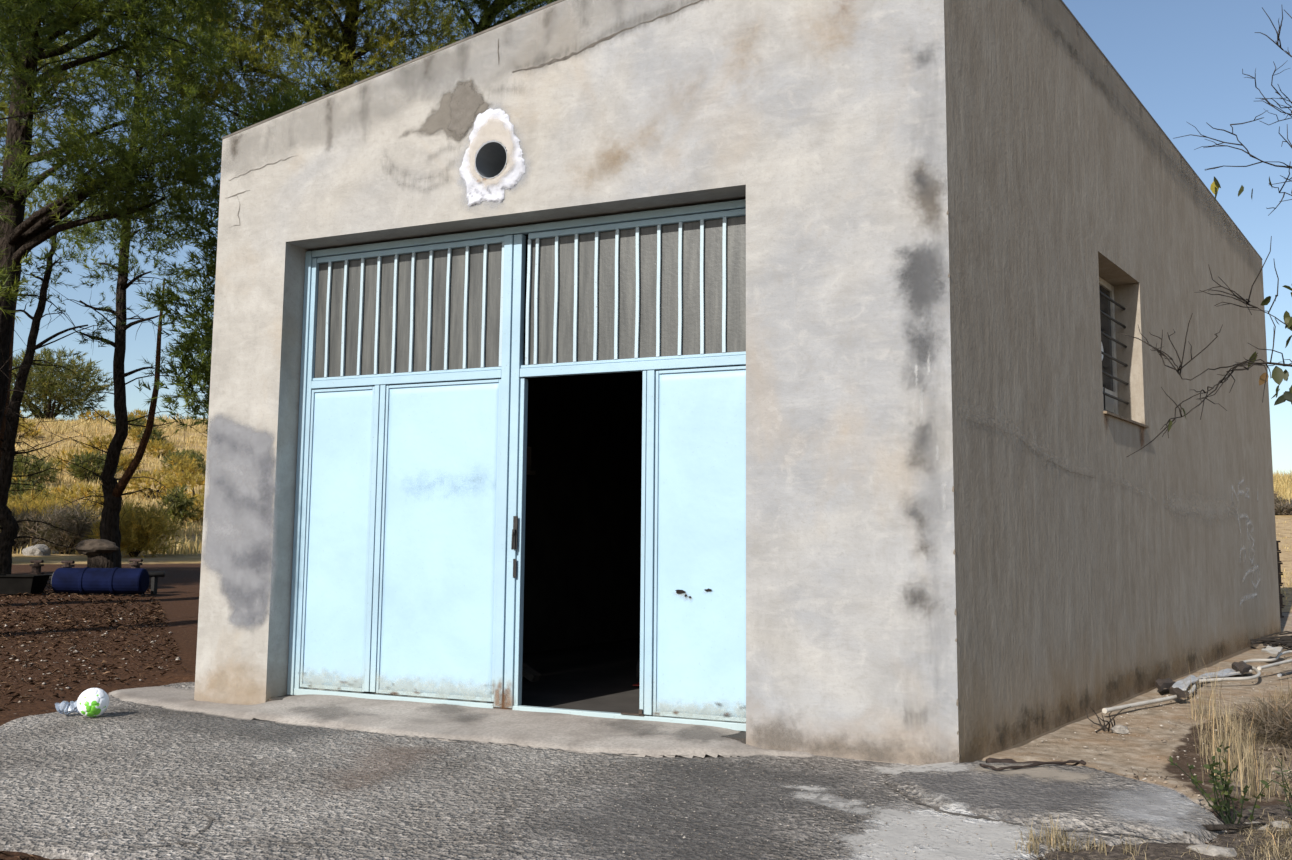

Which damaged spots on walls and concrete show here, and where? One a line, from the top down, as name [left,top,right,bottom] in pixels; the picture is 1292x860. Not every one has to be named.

crack [498,0,701,73]
spalling [403,81,488,141]
leakage [915,168,939,220]
leakage [901,251,941,314]
leakage [916,335,931,368]
rust [495,685,512,709]